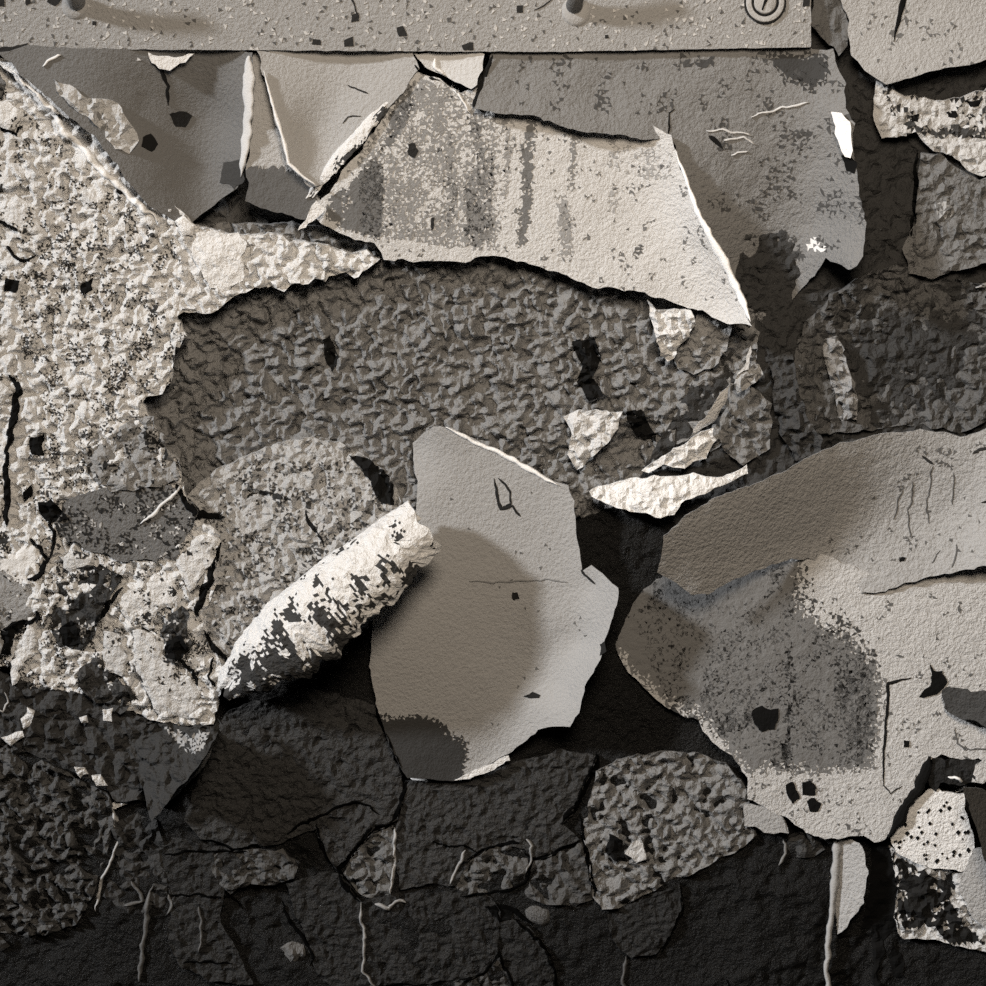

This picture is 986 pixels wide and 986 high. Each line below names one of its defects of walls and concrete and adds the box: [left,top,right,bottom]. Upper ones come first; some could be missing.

spalling [0,43,867,781]
peeling [525,0,986,910]
spalling [0,573,223,938]
peeling [835,839,868,934]
spalling [889,823,986,952]